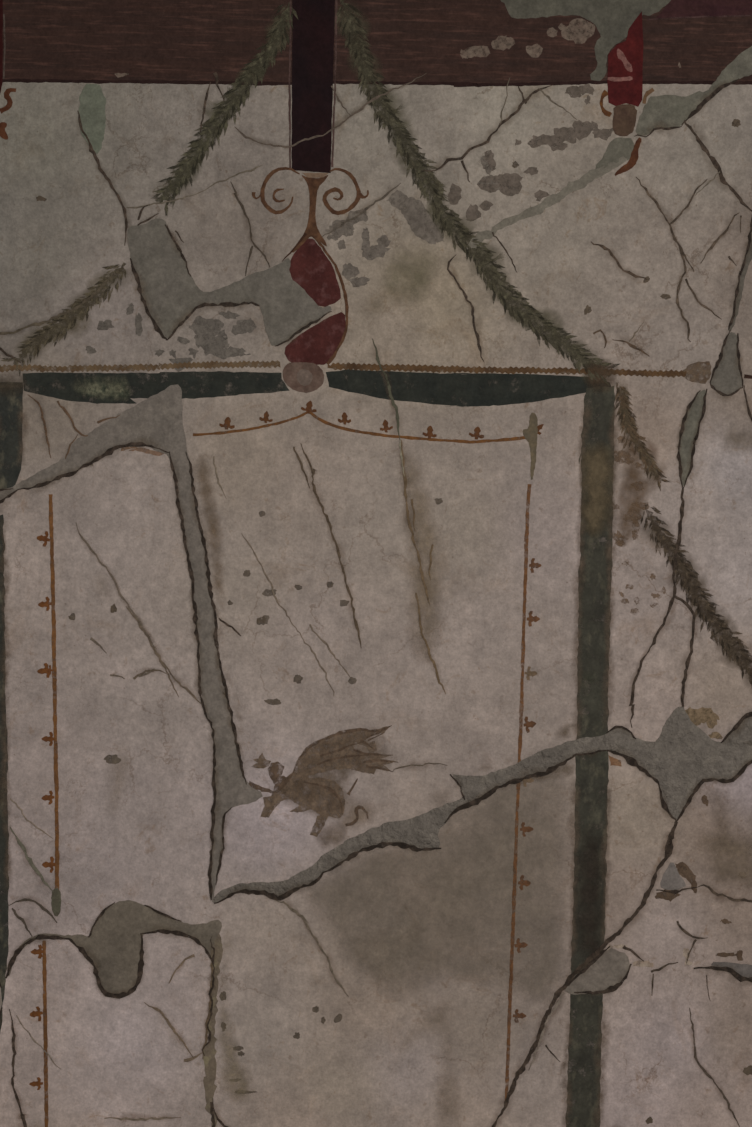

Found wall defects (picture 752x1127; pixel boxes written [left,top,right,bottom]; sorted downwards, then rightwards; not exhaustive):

peeling [460,18,595,59]
crack [0,72,425,363]
peeling [326,208,391,287]
crack [322,78,577,237]
peeling [448,150,549,221]
peeling [515,120,614,151]
peeling [155,311,256,372]
crack [373,340,446,694]
crack [393,79,752,1127]
crack [0,395,441,997]
peeling [655,862,697,902]
crack [0,798,215,1127]